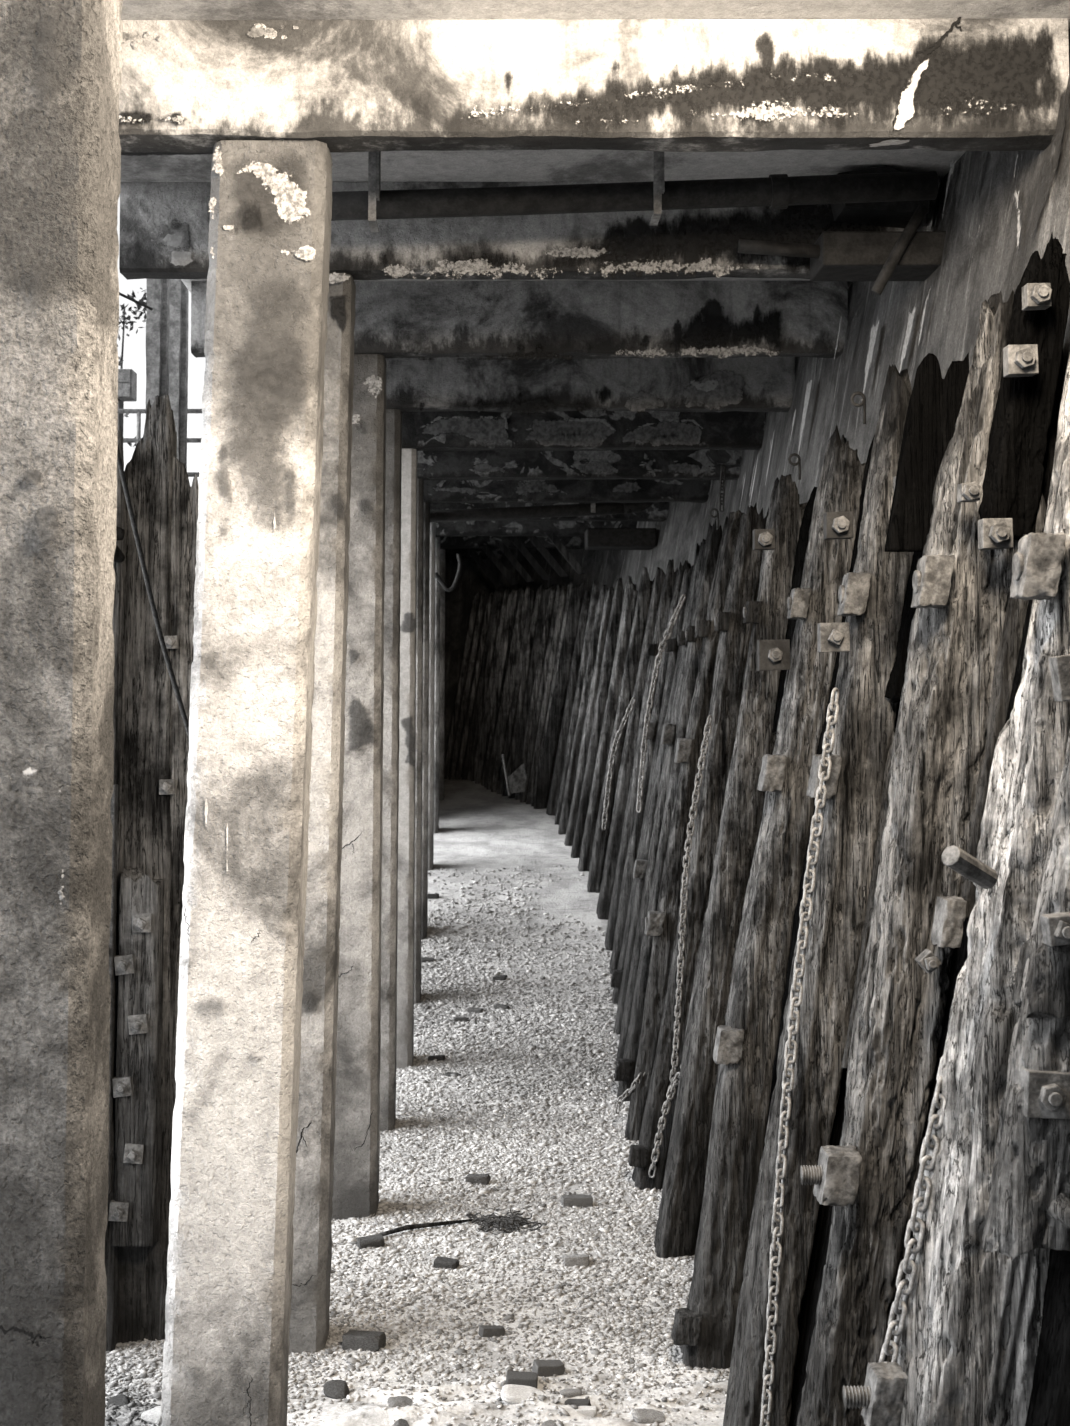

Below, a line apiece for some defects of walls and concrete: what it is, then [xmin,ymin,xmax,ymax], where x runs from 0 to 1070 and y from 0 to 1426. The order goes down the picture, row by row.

water stain [503,27,1062,147]
water stain [237,155,302,231]
water stain [453,252,519,275]
water stain [546,204,886,278]
water stain [671,299,782,354]
peeling [422,344,782,494]